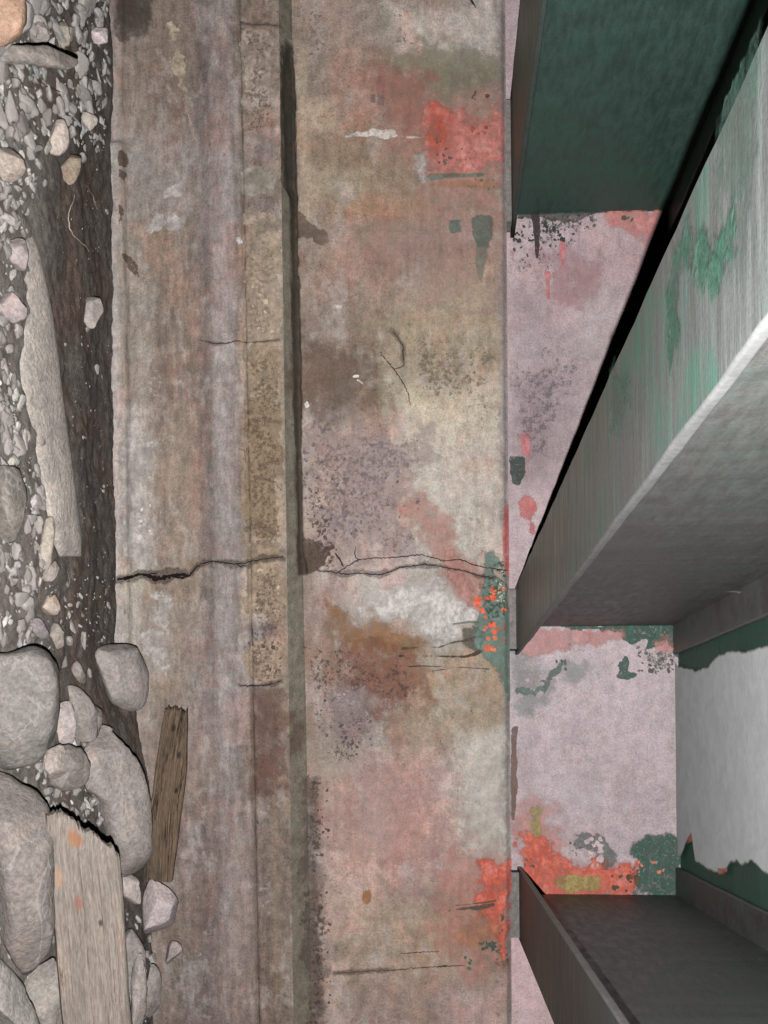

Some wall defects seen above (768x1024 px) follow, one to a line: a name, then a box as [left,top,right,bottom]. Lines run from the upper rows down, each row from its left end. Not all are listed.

crack [380,332,411,406]
crack [117,557,278,582]
crack [318,548,507,578]
peeling [444,496,679,701]
peeling [449,830,692,968]